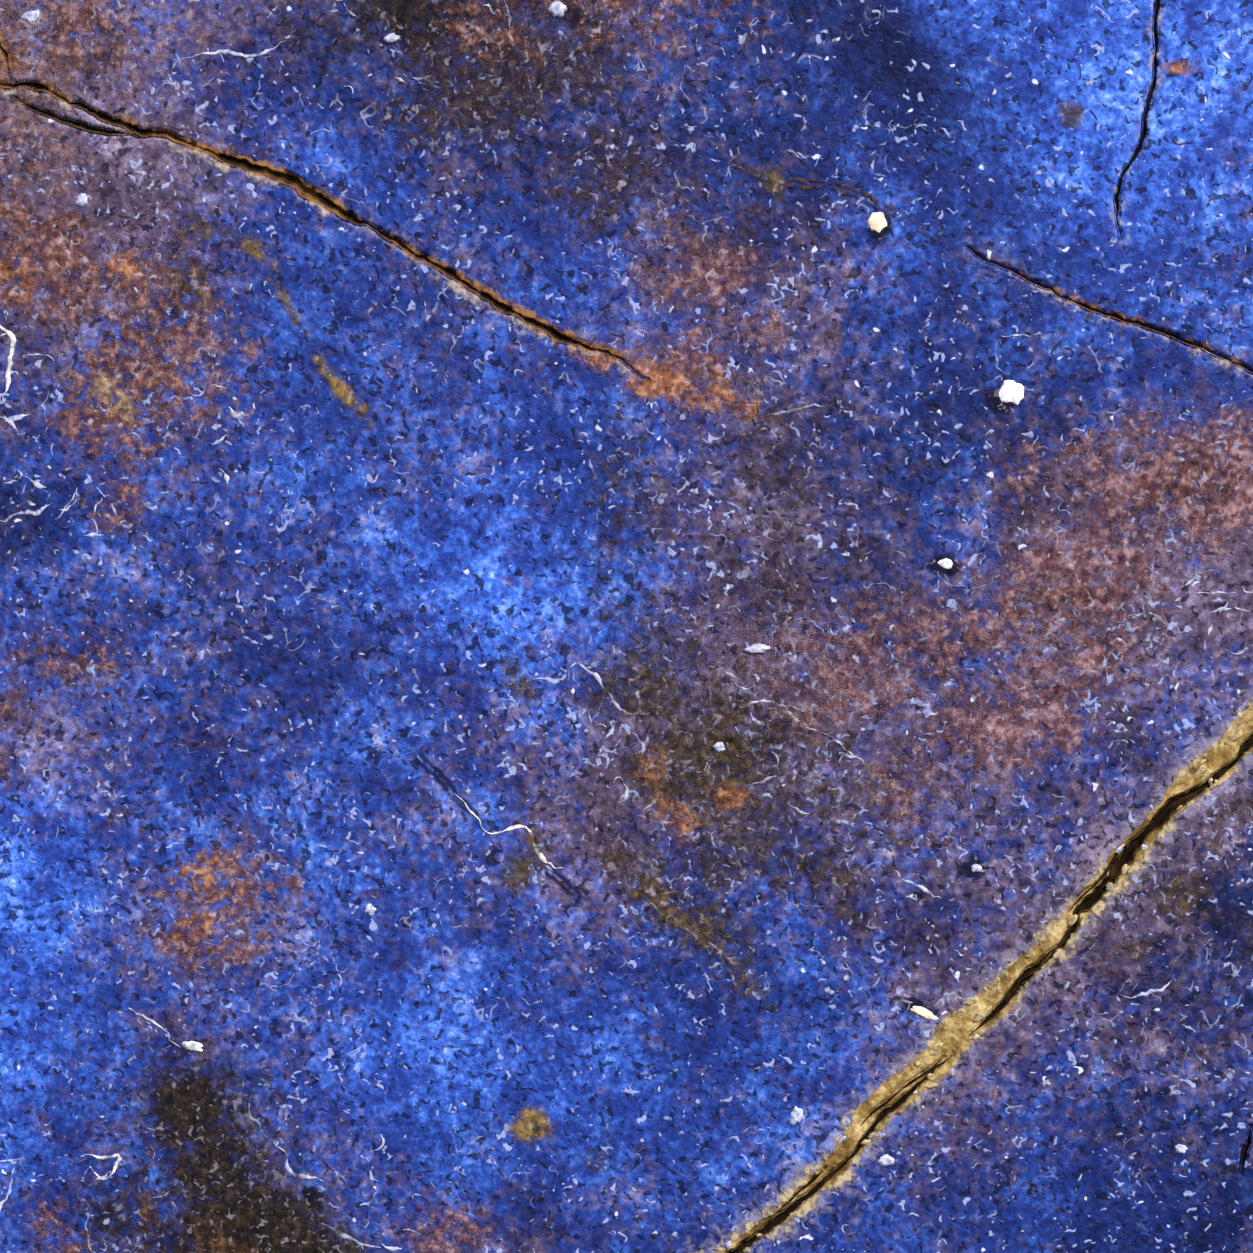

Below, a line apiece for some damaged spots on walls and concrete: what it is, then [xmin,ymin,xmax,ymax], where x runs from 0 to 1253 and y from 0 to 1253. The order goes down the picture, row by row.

crack [0,32,645,378]
crack [728,164,938,239]
crack [1114,0,1161,239]
crack [967,247,1253,373]
crack [417,752,584,901]
crack [716,703,1253,1253]
water stain [92,1052,359,1253]